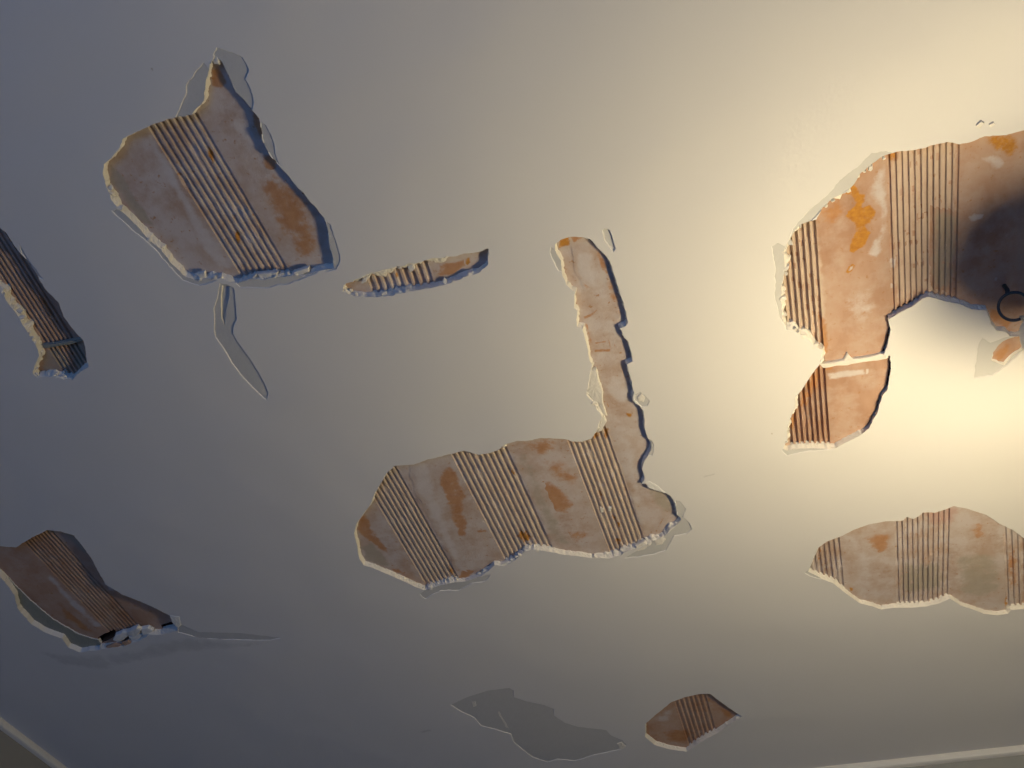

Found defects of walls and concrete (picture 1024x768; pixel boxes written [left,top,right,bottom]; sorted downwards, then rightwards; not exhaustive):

spalling [0,228,88,380]
spalling [103,47,340,401]
spalling [771,120,1024,456]
spalling [342,228,692,599]
spalling [0,530,280,652]
spalling [805,506,1024,615]
spalling [645,694,742,752]